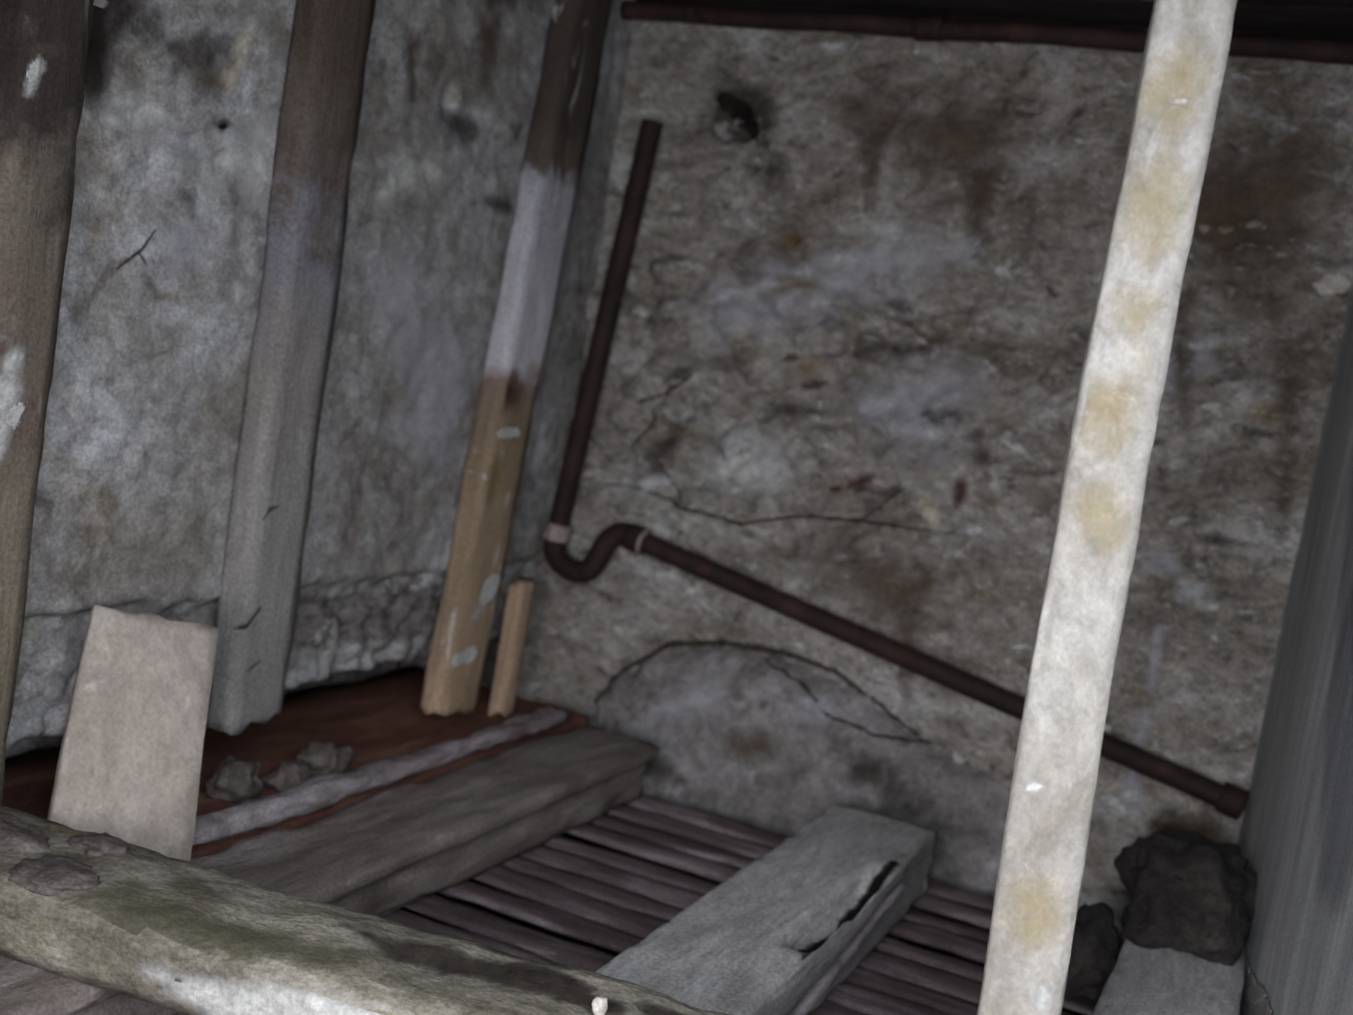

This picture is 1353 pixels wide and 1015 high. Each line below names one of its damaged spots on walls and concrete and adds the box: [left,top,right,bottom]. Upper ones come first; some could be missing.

spalling [714,89,772,141]
damp [1193,148,1308,312]
crack [605,370,969,537]
spalling [292,573,438,653]
damp [1025,782,1042,793]
damp [1035,986,1051,1015]